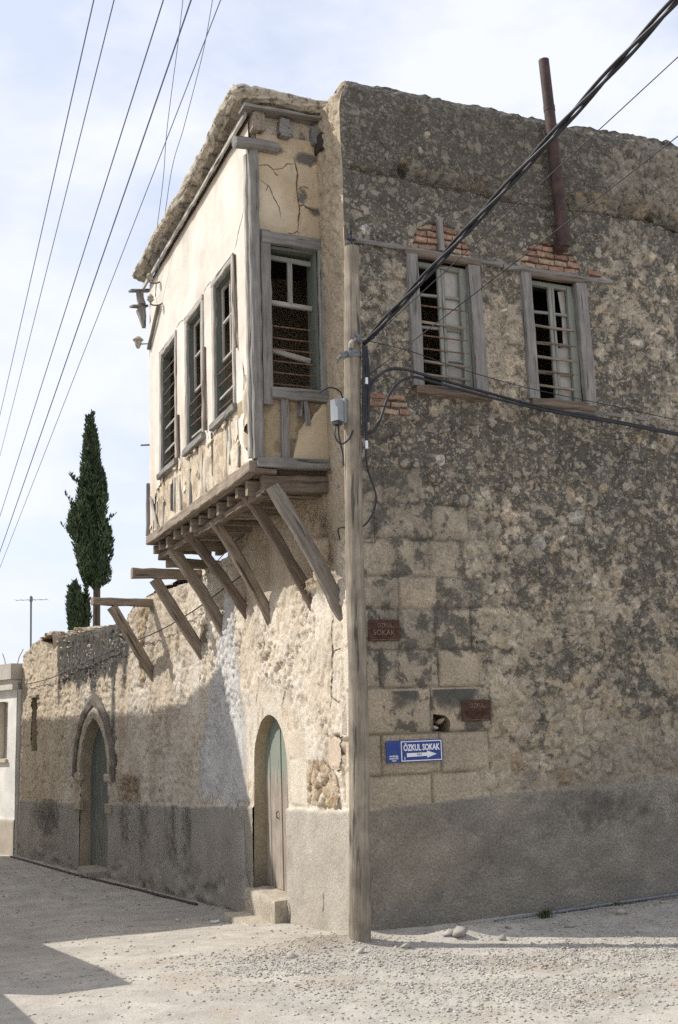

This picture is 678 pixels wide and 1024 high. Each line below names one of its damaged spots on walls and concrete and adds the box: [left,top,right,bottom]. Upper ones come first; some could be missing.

crack [261,157,317,234]
spalling [412,219,471,256]
spalling [519,241,601,277]
spalling [370,393,411,416]
spalling [306,760,340,809]